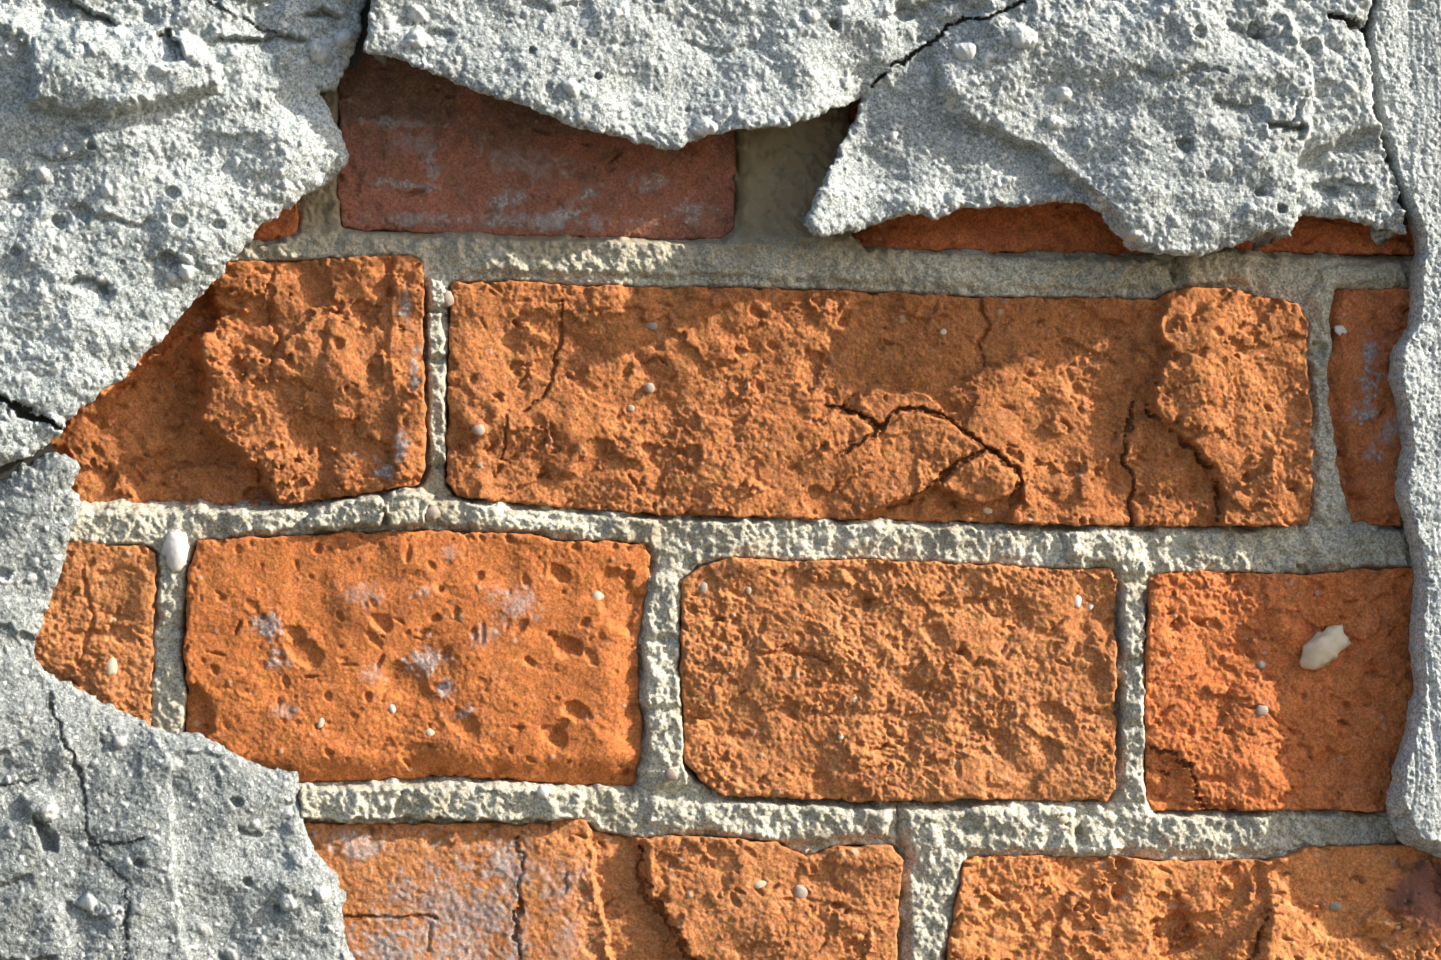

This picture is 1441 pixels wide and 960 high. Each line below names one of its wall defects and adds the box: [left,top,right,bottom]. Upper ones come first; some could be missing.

spalling [155,27,185,59]
crack [871,0,1026,88]
crack [1327,13,1364,33]
peeling [930,0,1407,257]
spalling [66,275,112,297]
crack [0,395,62,479]
spalling [51,288,278,507]
spalling [824,404,1026,524]
spalling [186,684,214,738]
spalling [33,817,58,854]
spalling [589,830,683,960]